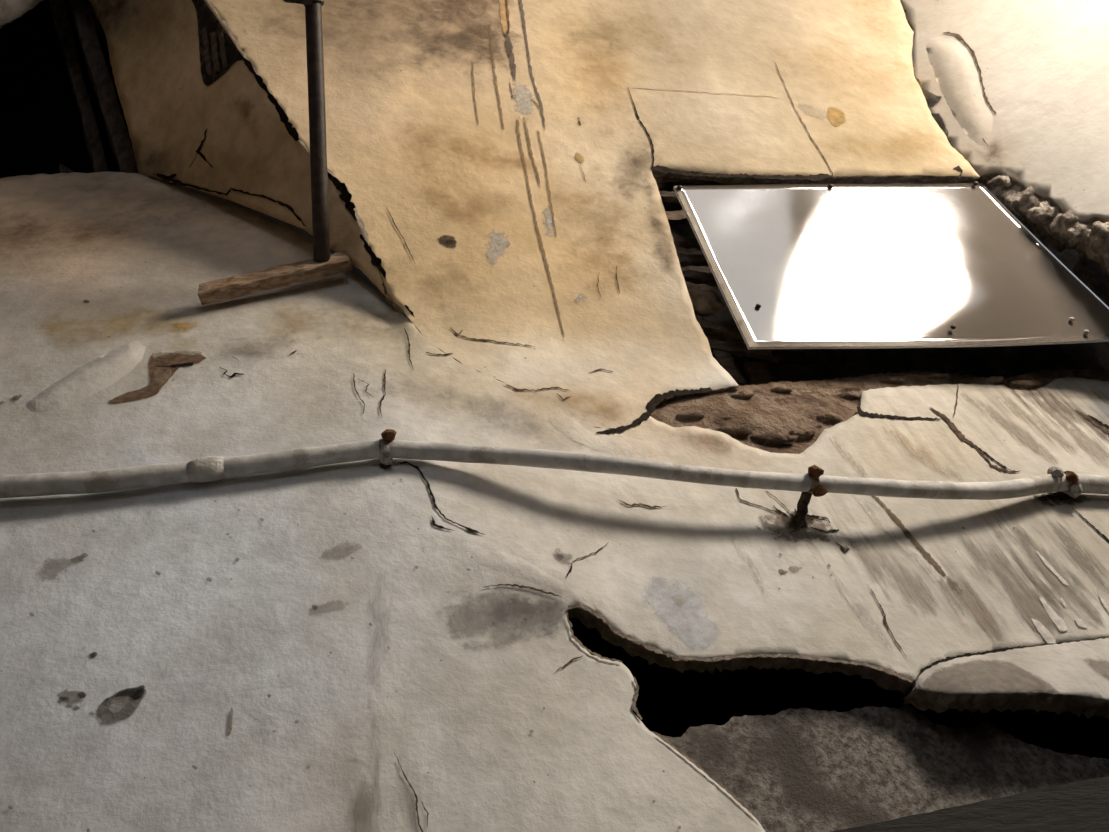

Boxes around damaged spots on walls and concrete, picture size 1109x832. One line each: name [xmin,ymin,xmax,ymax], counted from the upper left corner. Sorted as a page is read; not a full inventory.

water stain [478,0,564,336]
spalling [986,175,1109,275]
flaking render [109,351,206,404]
flaking render [650,368,1109,454]
crack [857,389,1020,473]
crack [398,461,485,535]
spalling [566,597,1109,821]
crack [394,753,429,832]